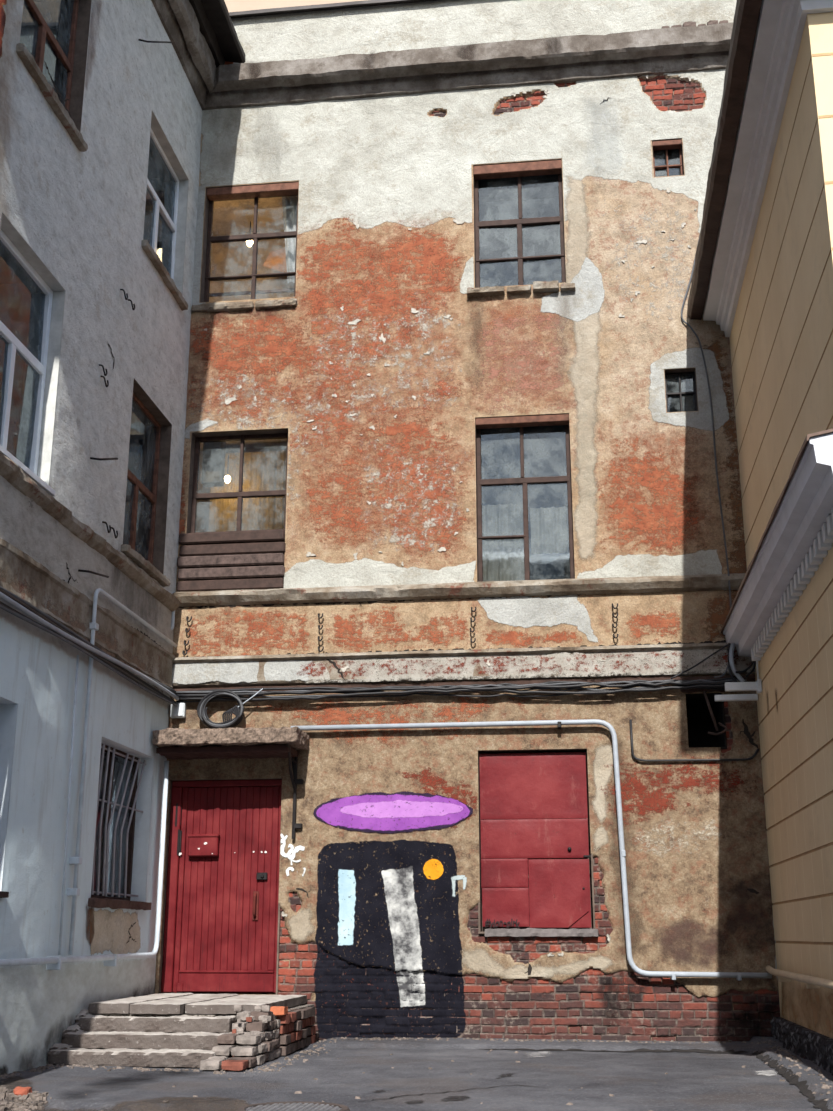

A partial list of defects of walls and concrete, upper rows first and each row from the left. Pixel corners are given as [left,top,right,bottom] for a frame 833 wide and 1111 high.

flaking render [187,69,726,566]
peeling [696,338,747,574]
peeling [183,590,756,746]
flaking render [277,892,781,1042]
flaking render [467,857,613,964]
water stain [662,921,725,963]
flaking render [726,875,773,950]